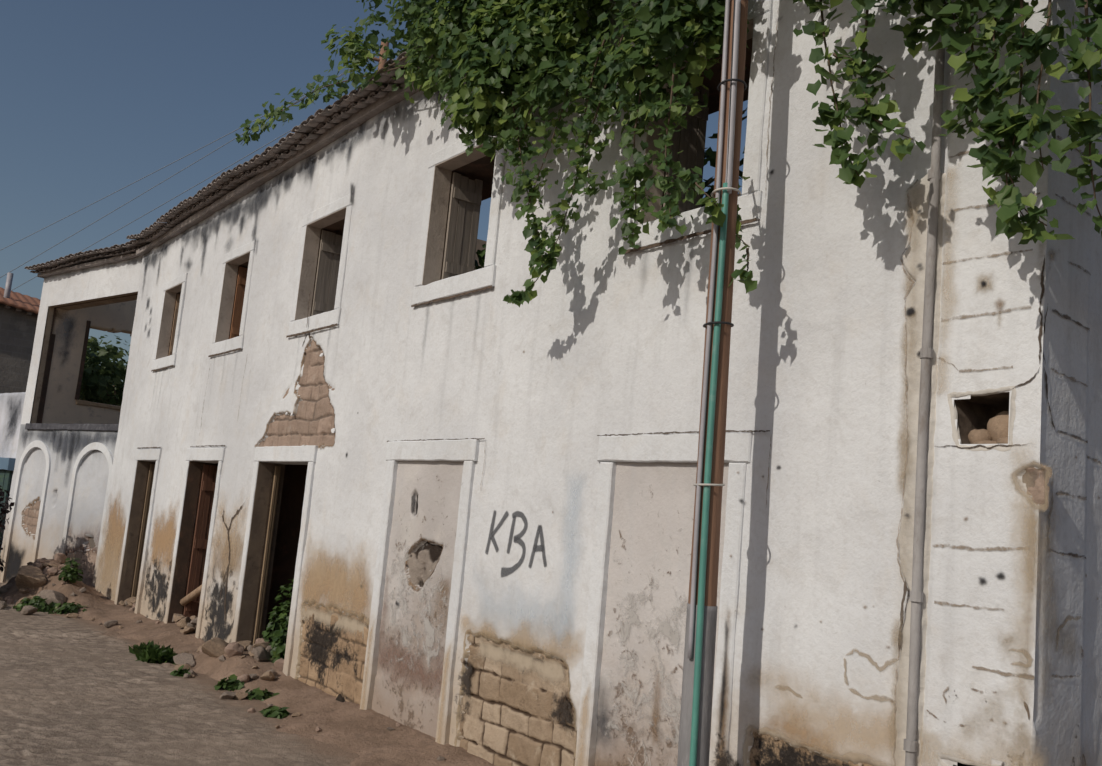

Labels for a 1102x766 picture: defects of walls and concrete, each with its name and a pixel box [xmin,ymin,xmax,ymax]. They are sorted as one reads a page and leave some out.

leakage [181,123,365,267]
flaking render [255,336,335,448]
crack [937,442,1026,450]
crack [1014,258,1055,429]
leakage [145,558,172,622]
leakage [202,511,240,642]
crack [219,505,243,621]
flaking render [403,538,443,591]
flaking render [294,598,370,705]
flaking render [455,630,577,766]
leakage [743,726,885,766]
crack [844,650,895,701]